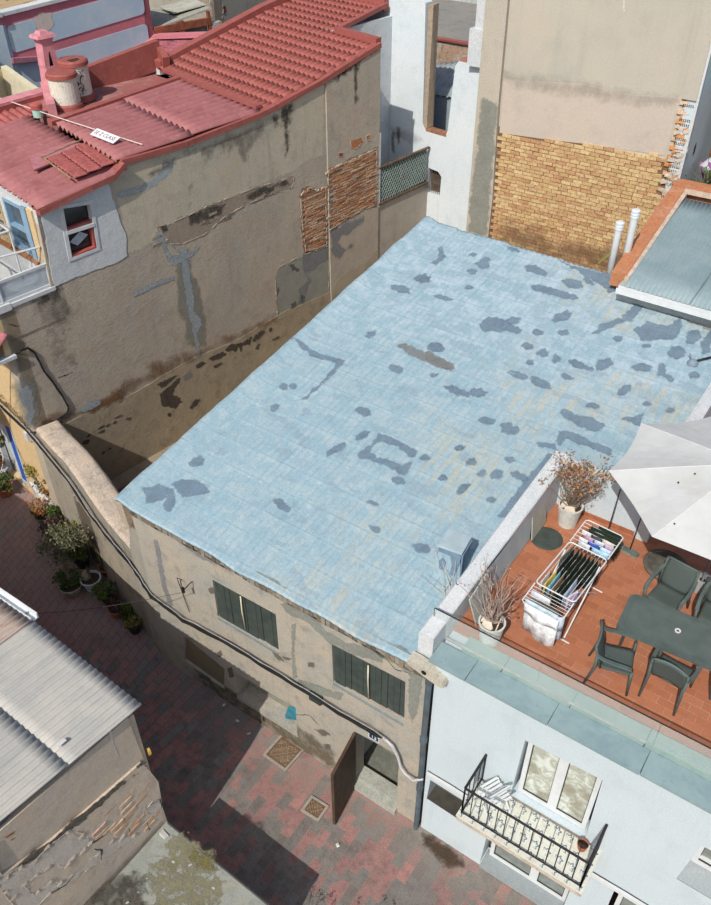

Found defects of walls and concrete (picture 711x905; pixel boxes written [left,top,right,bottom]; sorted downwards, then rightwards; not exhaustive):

flaking render [151,134,379,253]
spalling [662,118,697,198]
peeling [0,830,136,905]
water stain [84,871,145,905]